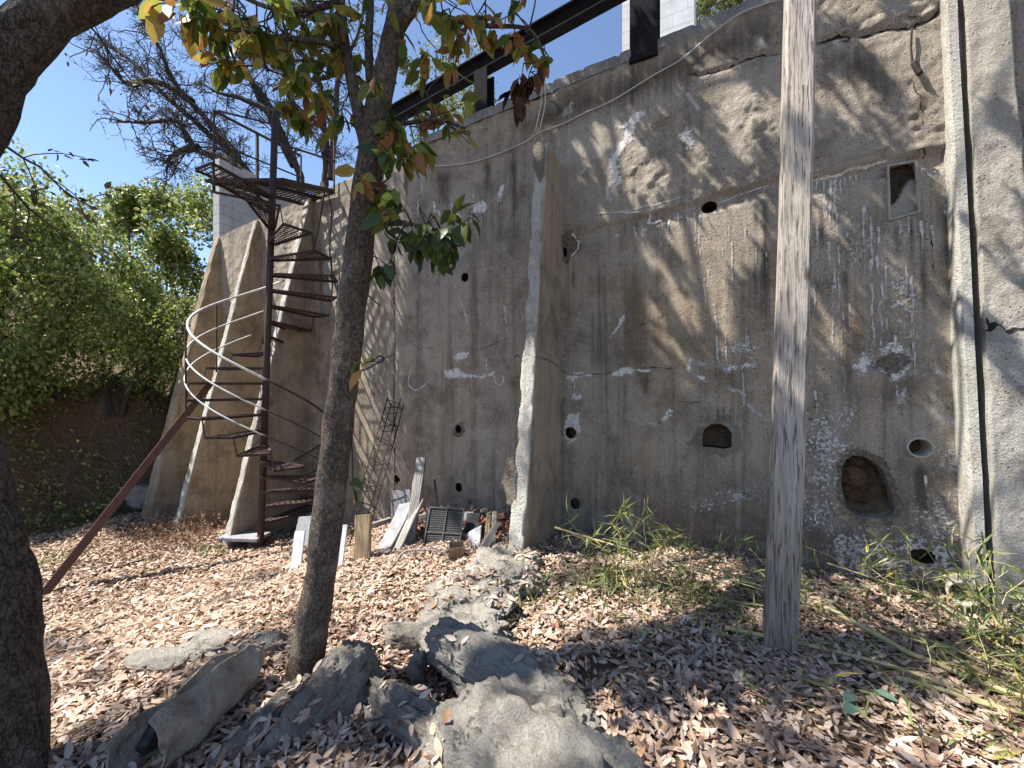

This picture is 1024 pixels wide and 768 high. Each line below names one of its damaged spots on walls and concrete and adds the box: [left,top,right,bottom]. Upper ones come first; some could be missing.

water stain [813,159,952,410]
crack [985,317,1024,333]
spalling [836,450,904,527]
water stain [803,390,962,590]